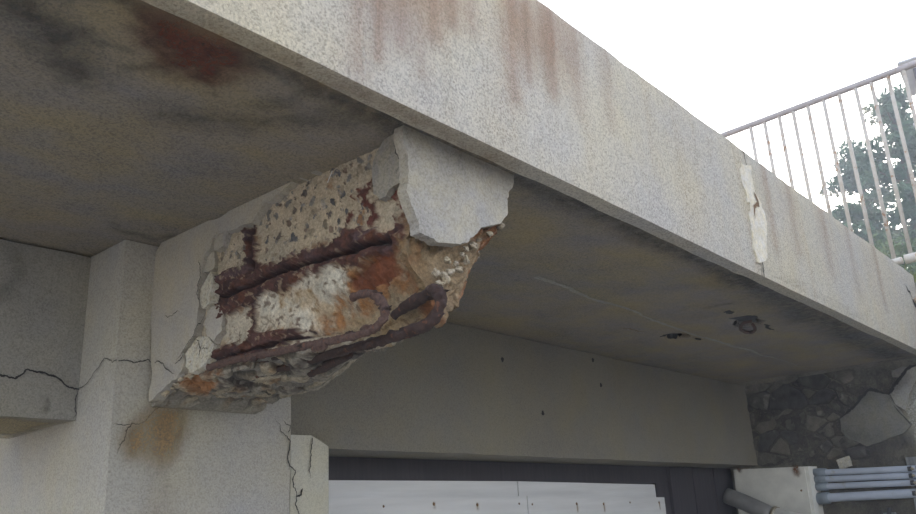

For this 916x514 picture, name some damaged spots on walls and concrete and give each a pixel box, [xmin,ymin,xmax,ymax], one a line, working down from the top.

rust [141,12,242,84]
spalling [151,148,505,414]
spalling [724,310,774,334]
crack [0,356,183,417]
flaking render [745,365,916,469]
crack [280,420,313,514]